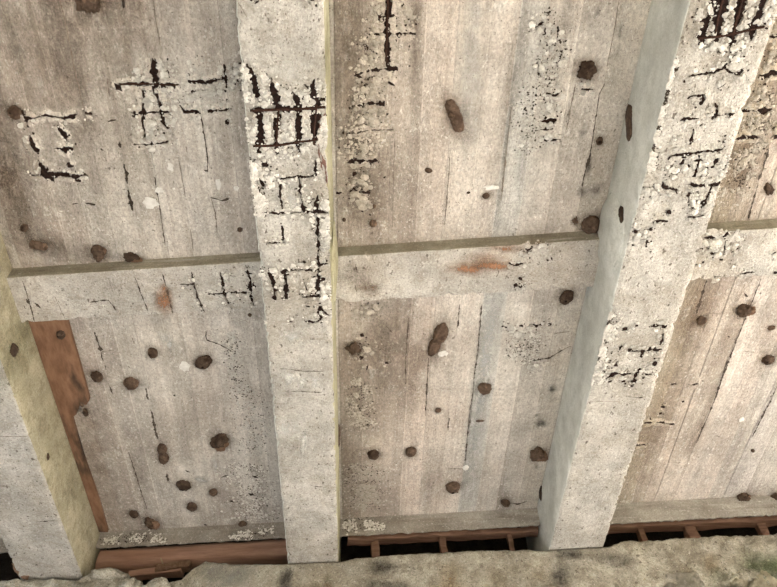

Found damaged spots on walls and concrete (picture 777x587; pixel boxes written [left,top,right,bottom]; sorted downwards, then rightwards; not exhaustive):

spalling [109,0,422,328]
spalling [510,7,572,155]
spalling [579,79,595,97]
spalling [627,0,777,283]
rust [454,256,508,273]
spalling [593,314,670,390]